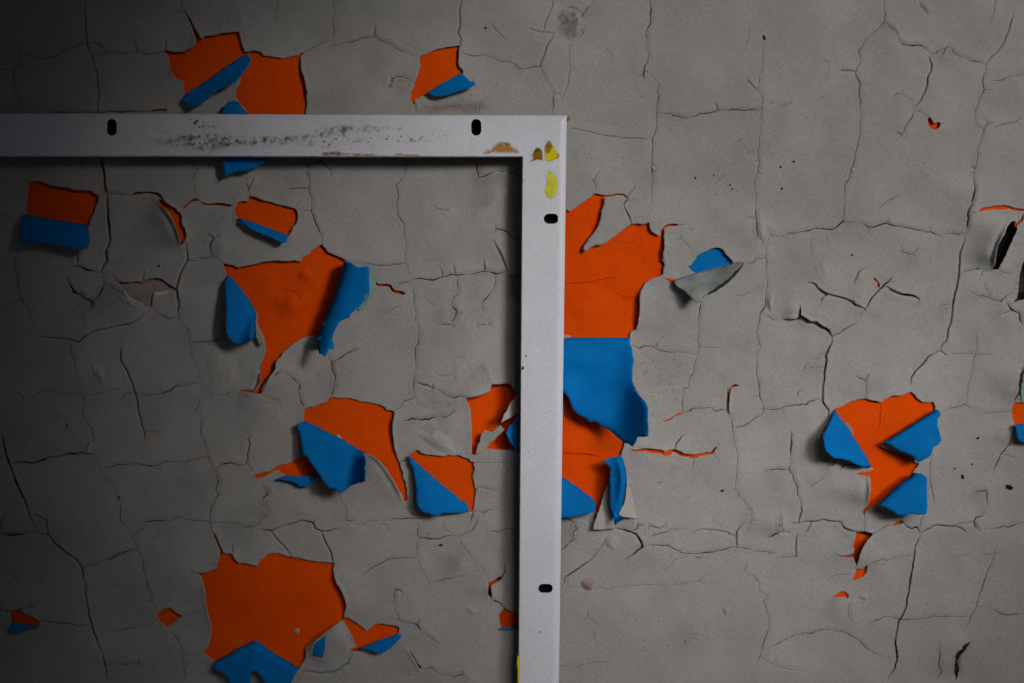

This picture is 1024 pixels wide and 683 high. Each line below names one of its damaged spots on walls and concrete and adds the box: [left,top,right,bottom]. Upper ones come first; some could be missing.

crack [3,0,171,113]
peeling [165,8,307,114]
crack [305,1,420,87]
peeling [410,45,476,104]
peeling [231,196,298,243]
crack [0,157,517,680]
peeling [223,244,377,394]
peeling [254,383,520,516]
peeling [561,193,745,530]
crack [458,0,1024,680]
peeling [823,392,942,516]
peeling [198,534,401,683]